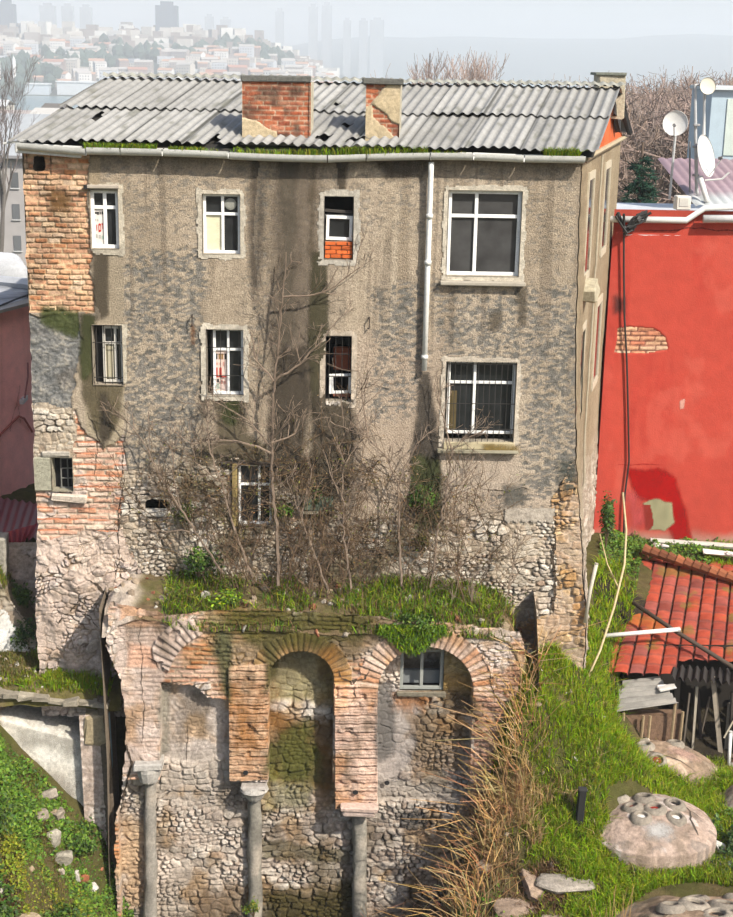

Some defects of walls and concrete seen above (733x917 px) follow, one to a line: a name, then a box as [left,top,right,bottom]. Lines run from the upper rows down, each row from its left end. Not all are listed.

flaking render [615,326,668,353]